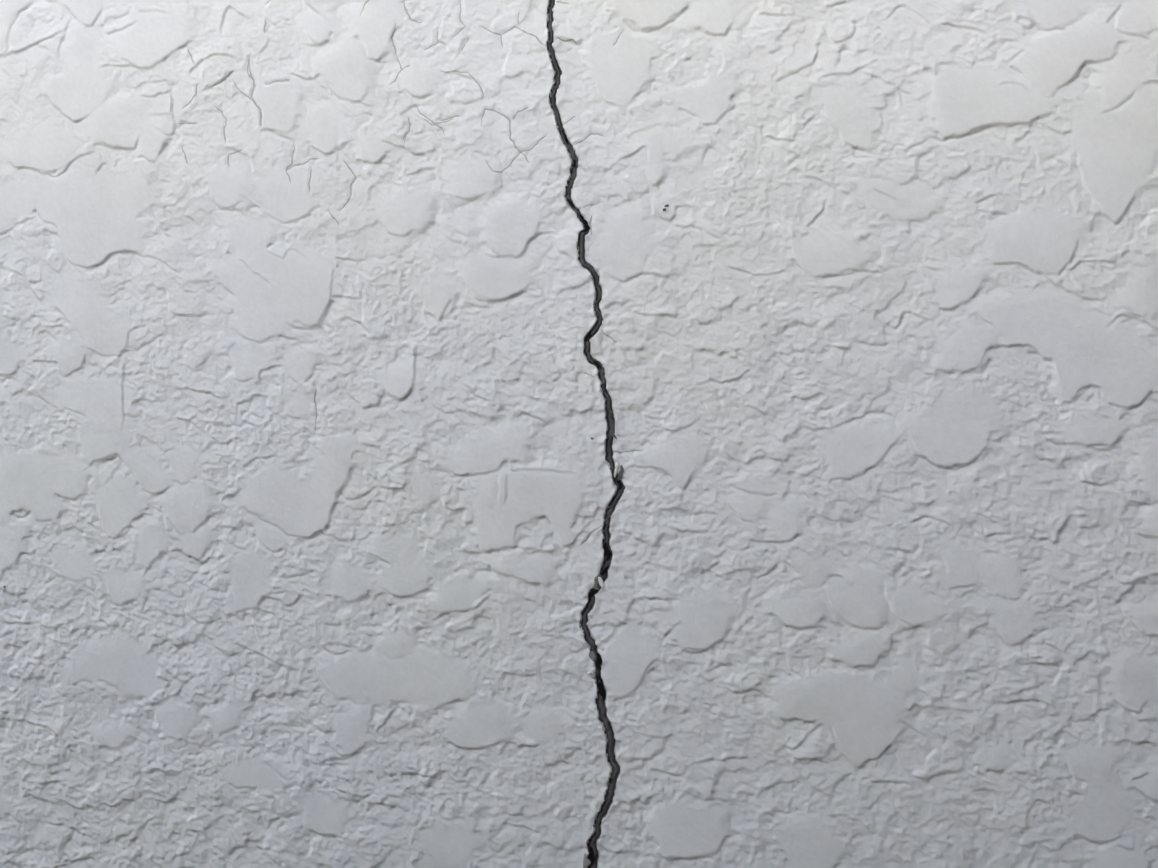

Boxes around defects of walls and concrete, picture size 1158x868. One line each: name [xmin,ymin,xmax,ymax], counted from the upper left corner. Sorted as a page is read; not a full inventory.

crack [390,0,643,868]